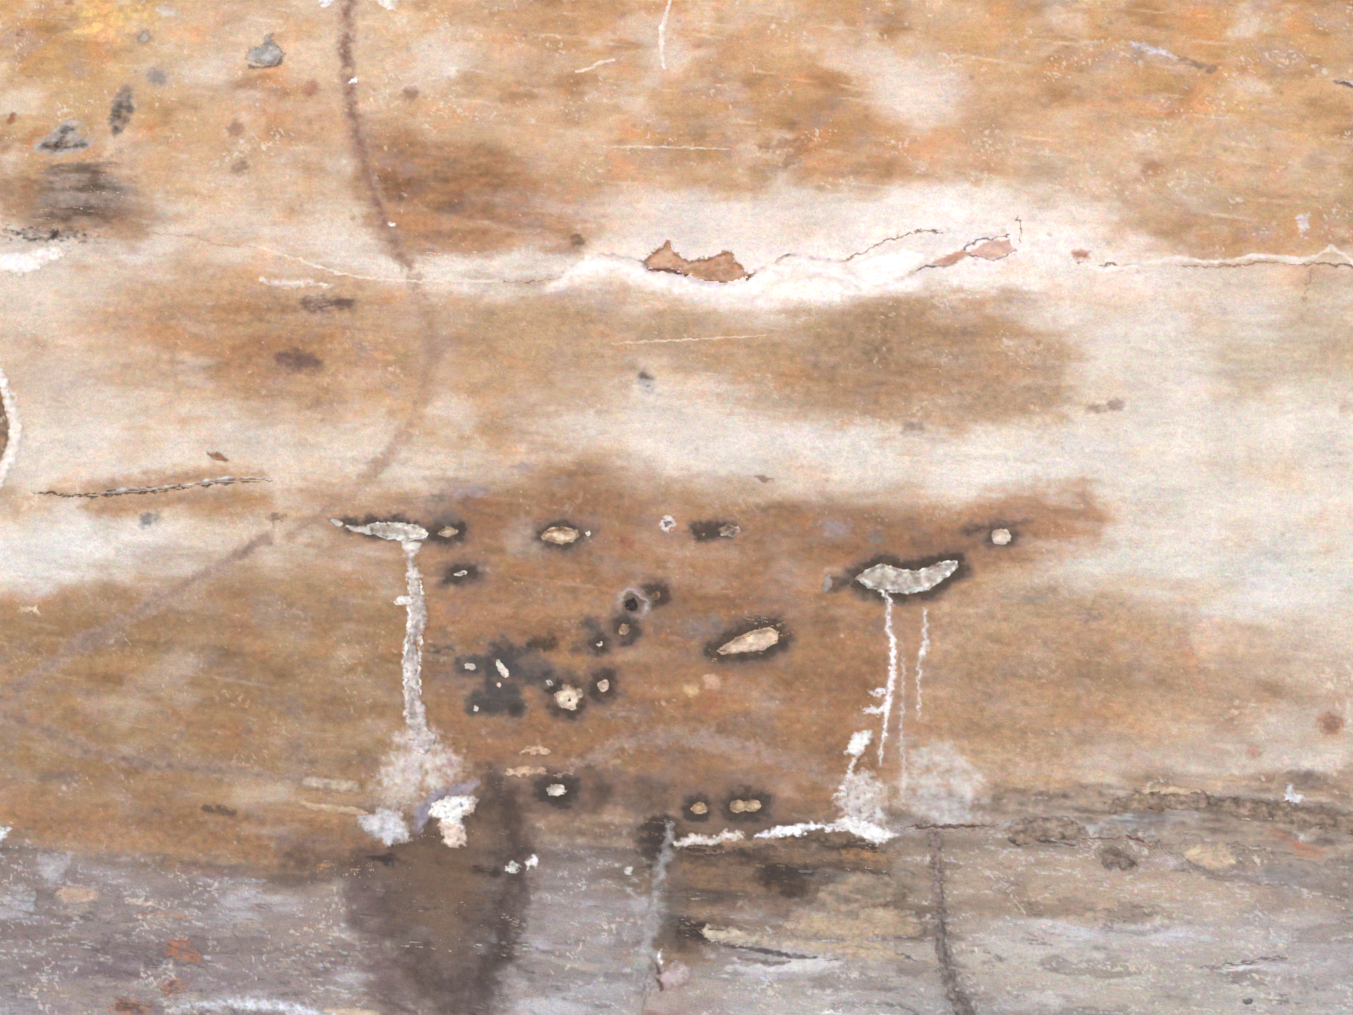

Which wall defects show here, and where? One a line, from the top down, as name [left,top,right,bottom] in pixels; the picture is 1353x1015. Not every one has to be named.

crack [251,214,1024,312]
spalling [643,239,753,285]
crack [1069,243,1353,305]
spalling [0,354,27,492]
crack [31,449,289,533]
leakage [0,0,564,806]
rust [0,110,1126,823]
leakage [816,511,889,545]
leakage [897,416,930,444]
leakage [1083,396,1126,416]
leakage [200,803,239,819]
leakage [261,557,1294,1015]